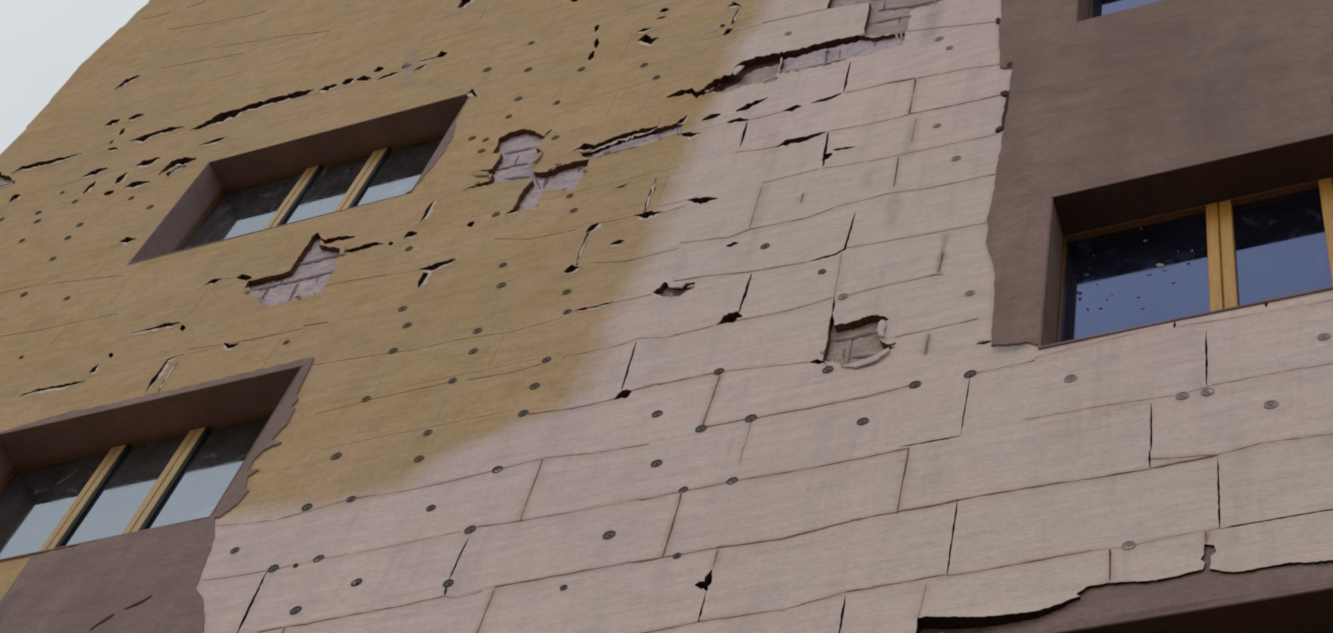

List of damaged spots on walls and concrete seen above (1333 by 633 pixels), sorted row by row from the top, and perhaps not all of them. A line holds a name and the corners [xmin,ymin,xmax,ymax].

crack [9,51,447,203]
spalling [463,123,683,212]
crack [571,0,861,166]
spalling [705,0,944,93]
spalling [237,233,393,306]
spalling [810,299,896,368]
crack [237,572,267,633]
crack [695,569,712,622]
spalling [916,544,1333,633]